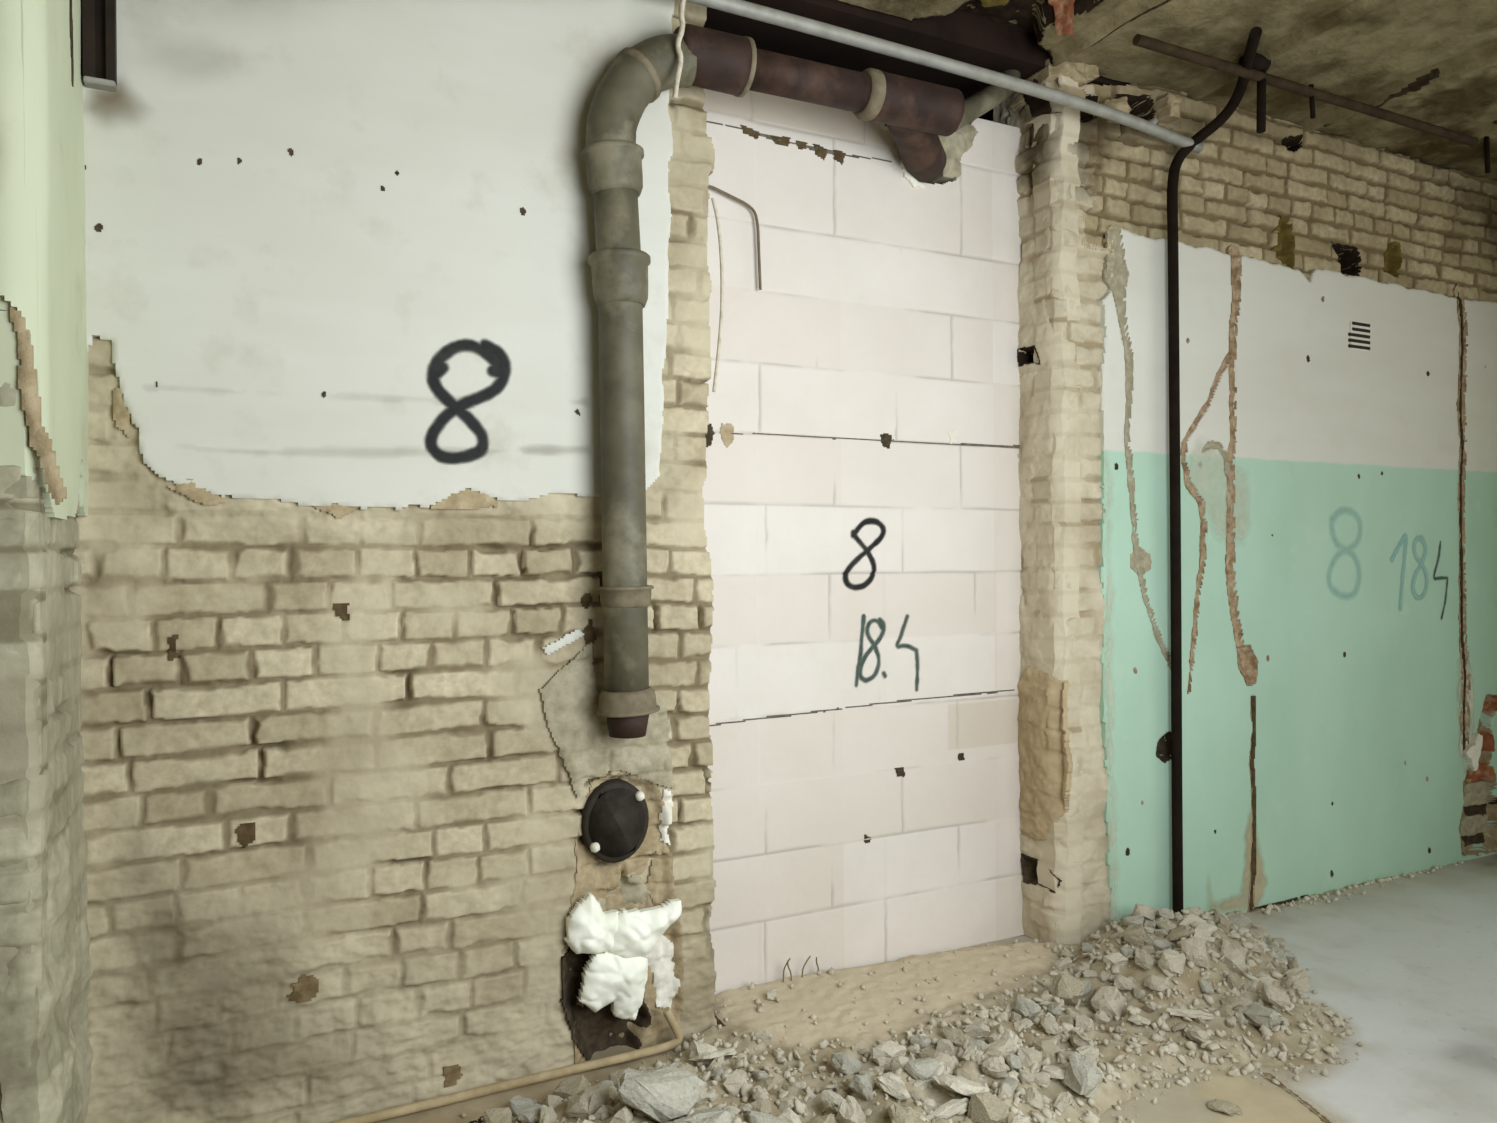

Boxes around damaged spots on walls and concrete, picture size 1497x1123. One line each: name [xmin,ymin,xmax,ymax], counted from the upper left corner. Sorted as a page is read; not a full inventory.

flaking render [671,0,707,34]
flaking render [0,86,734,1123]
spalling [1458,658,1497,856]